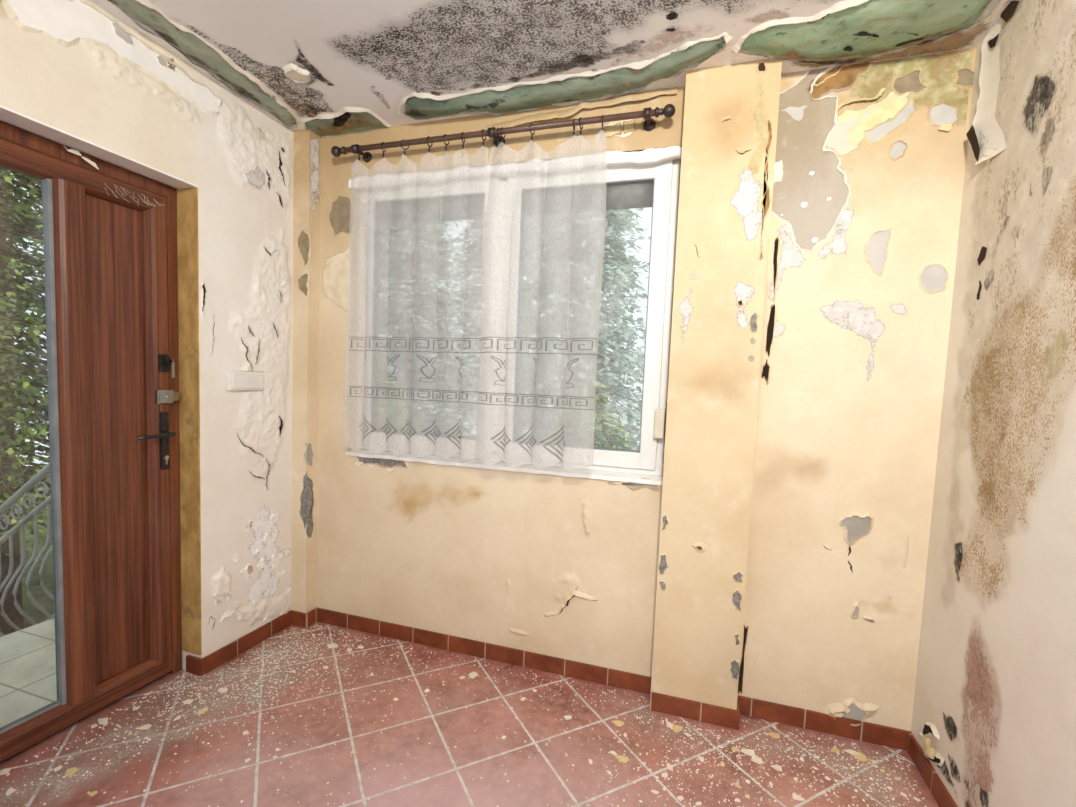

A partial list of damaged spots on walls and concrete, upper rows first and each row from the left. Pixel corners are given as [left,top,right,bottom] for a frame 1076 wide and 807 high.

water stain [331,0,788,100]
peeling [953,0,1019,165]
water stain [1024,31,1076,196]
peeling [730,61,959,308]
water stain [997,161,1019,237]
water stain [954,187,1076,598]
peeling [212,505,292,628]
spalling [300,442,314,538]
crack [544,590,598,617]
peeling [838,512,874,573]
peeling [823,698,879,727]
water stain [937,630,997,807]